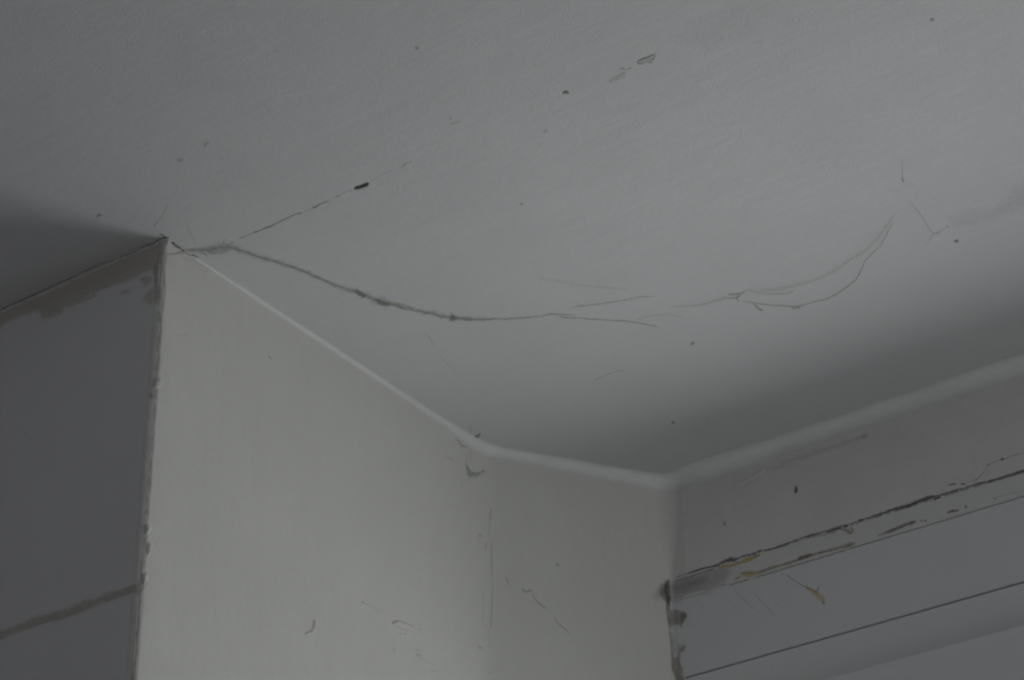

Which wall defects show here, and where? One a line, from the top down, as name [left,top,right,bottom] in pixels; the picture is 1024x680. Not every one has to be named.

crack [0,163,946,328]
crack [669,452,1024,582]